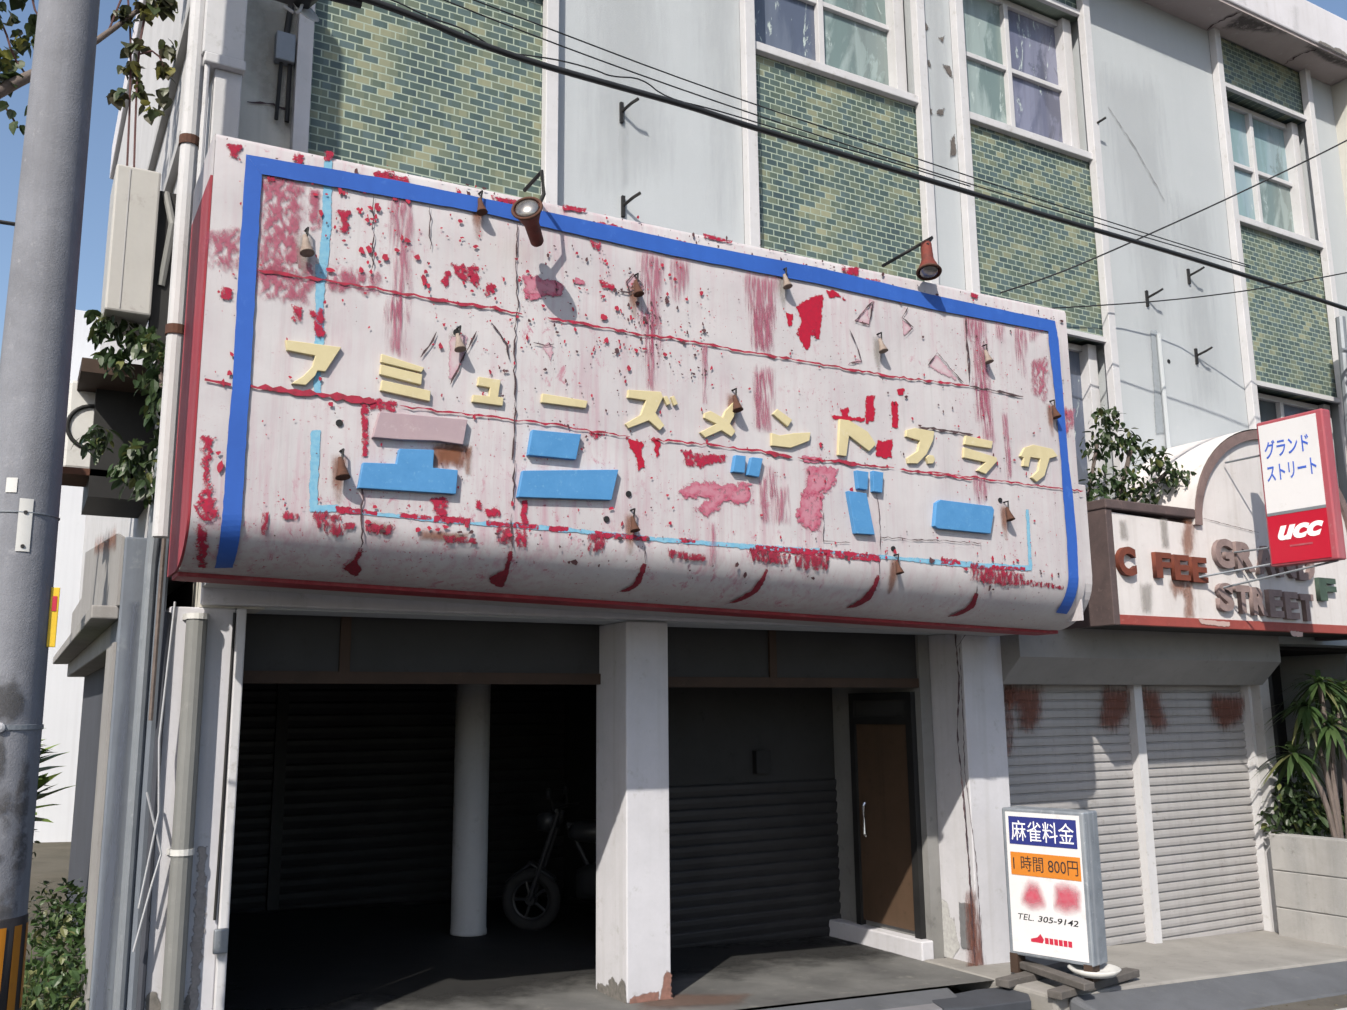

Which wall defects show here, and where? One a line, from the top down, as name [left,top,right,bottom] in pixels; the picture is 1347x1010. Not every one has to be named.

peeling [226,138,243,160]
peeling [291,300,326,337]
peeling [311,183,739,463]
peeling [783,290,883,368]
peeling [832,378,922,480]
peeling [255,407,910,584]
peeling [920,525,1064,591]
leakage [0,683,24,718]
corrosion [1005,685,1041,753]
corrosion [1100,685,1167,730]
corrosion [1212,692,1245,730]
spalling [597,972,673,1004]